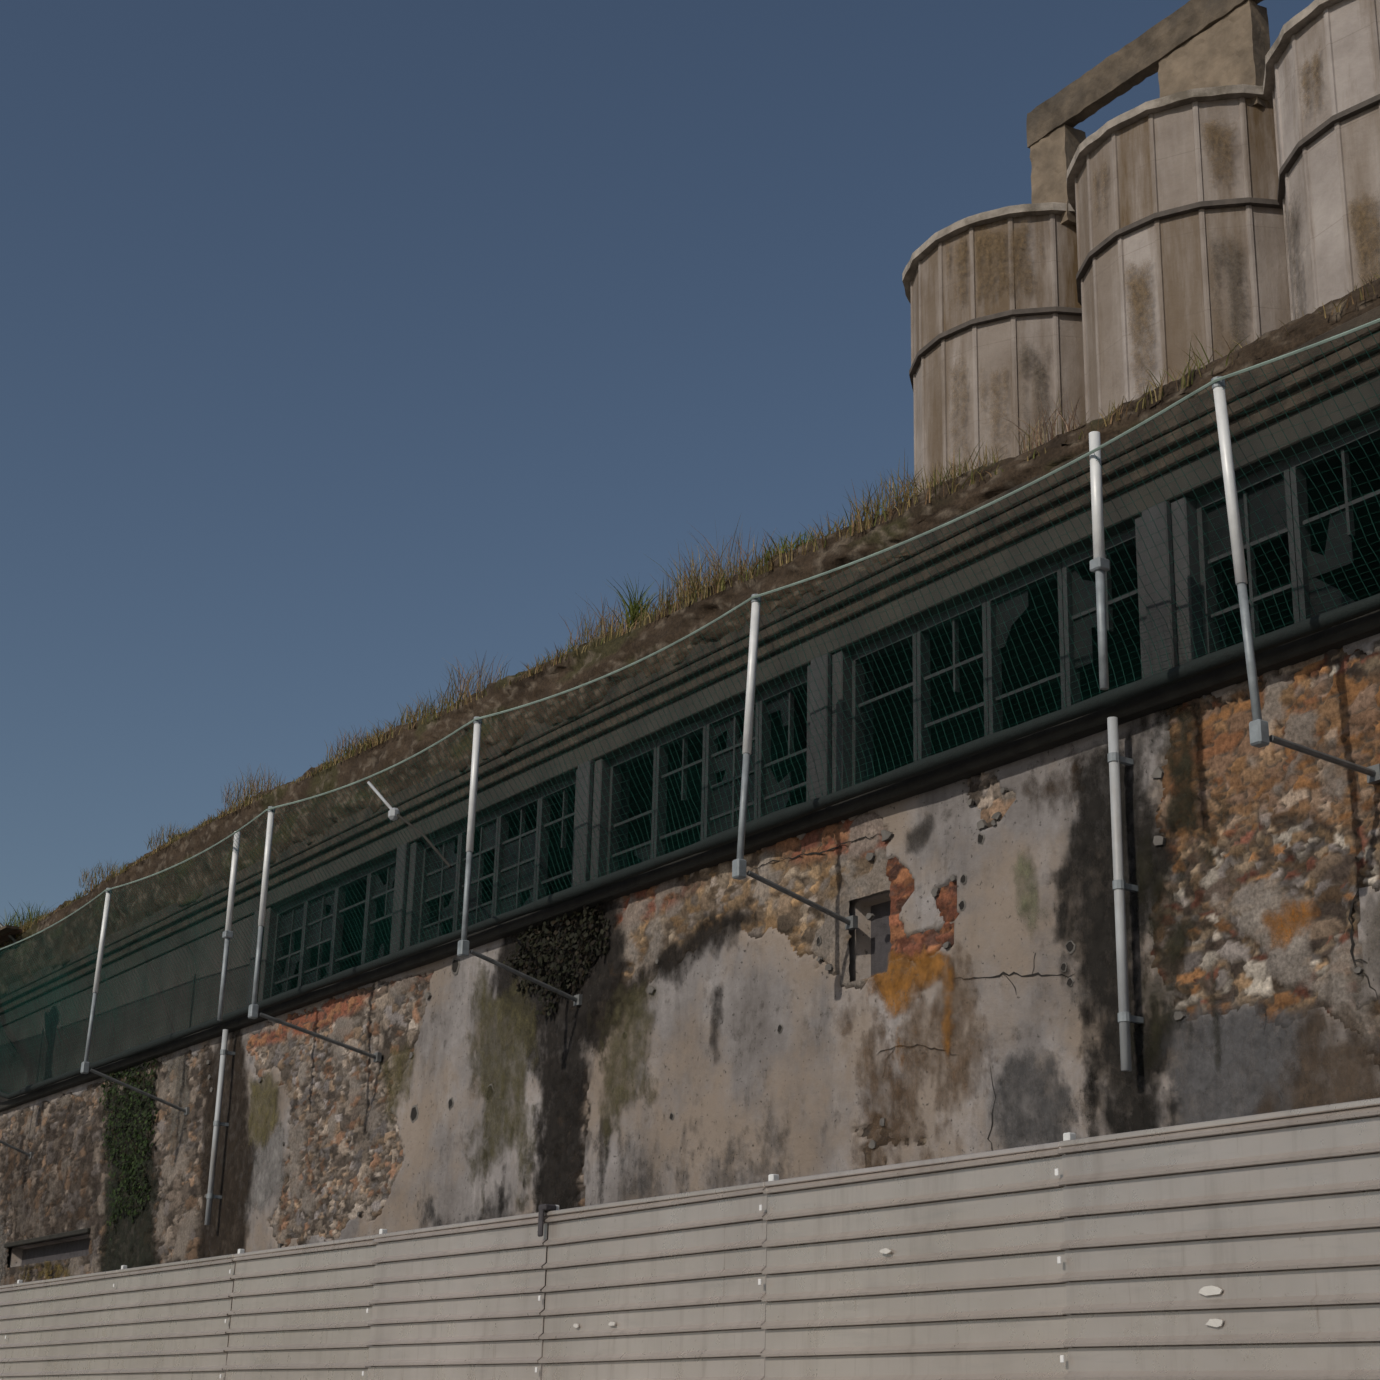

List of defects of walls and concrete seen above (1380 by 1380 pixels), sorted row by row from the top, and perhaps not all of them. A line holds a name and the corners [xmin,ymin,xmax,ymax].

spalling [246,972,434,1248]
spalling [451,958,460,975]
leakage [478,1190,507,1221]
leakage [491,900,754,1342]
spalling [596,812,967,1020]
crack [958,953,1074,992]
leakage [995,705,1380,1154]
spalling [1149,640,1380,1071]